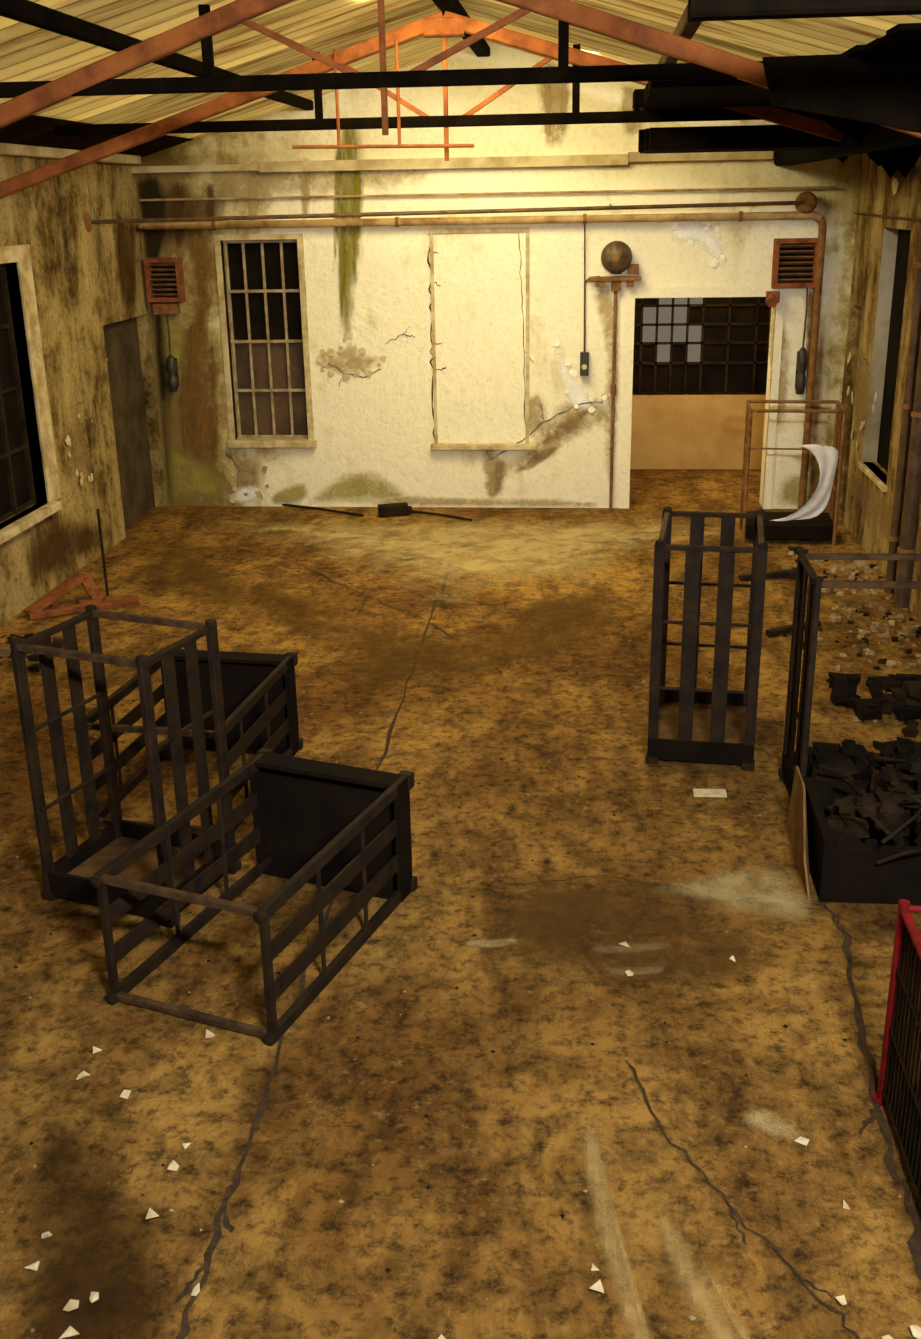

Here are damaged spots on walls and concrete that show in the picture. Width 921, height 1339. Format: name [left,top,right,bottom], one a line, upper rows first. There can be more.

water stain [208,150,399,311]
peeling [316,331,386,382]
crack [296,532,461,770]
crack [174,1033,284,1339]
crack [625,1060,860,1339]